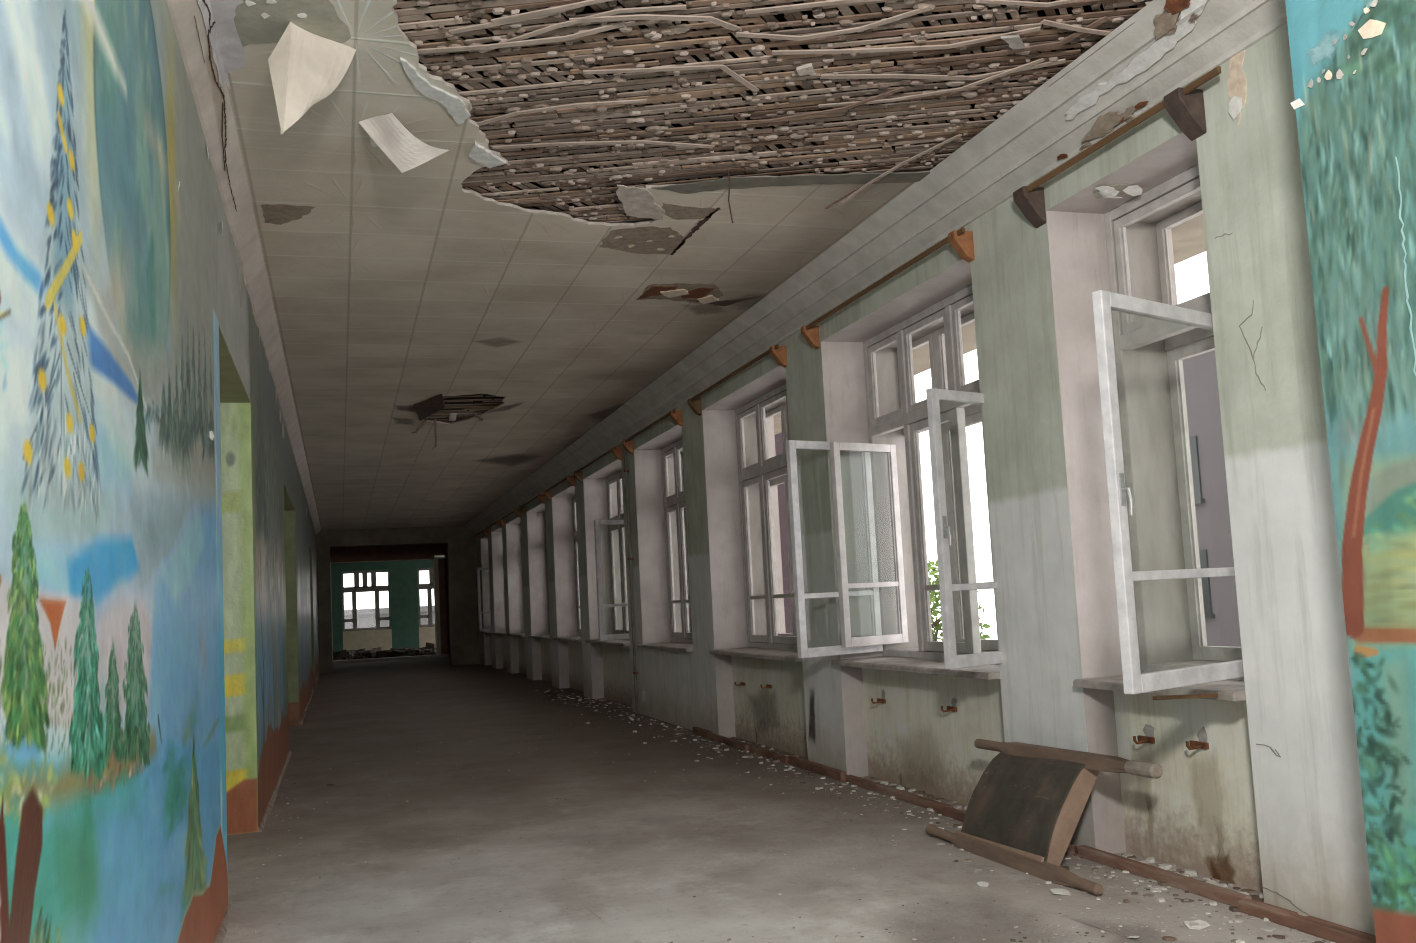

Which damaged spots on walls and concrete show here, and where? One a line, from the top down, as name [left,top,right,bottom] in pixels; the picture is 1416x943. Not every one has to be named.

crack [194,0,237,211]
peeling [197,0,351,89]
flaking render [1057,0,1208,160]
peeling [1227,50,1247,125]
peeling [1290,0,1386,110]
peeling [261,204,315,225]
peeling [599,185,721,255]
peeling [1093,184,1142,199]